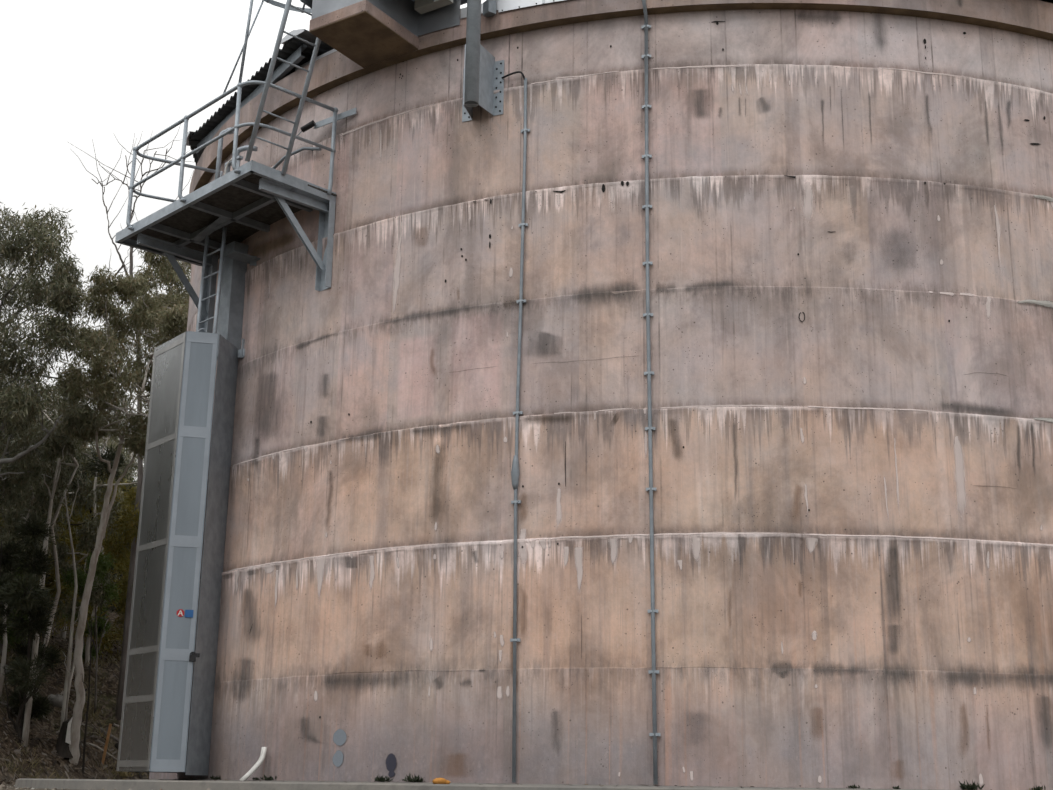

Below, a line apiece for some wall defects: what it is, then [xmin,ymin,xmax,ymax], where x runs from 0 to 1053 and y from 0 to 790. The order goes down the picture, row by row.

water stain [954,436,966,511]
water stain [229,543,446,605]
water stain [519,529,774,588]
water stain [806,534,970,552]